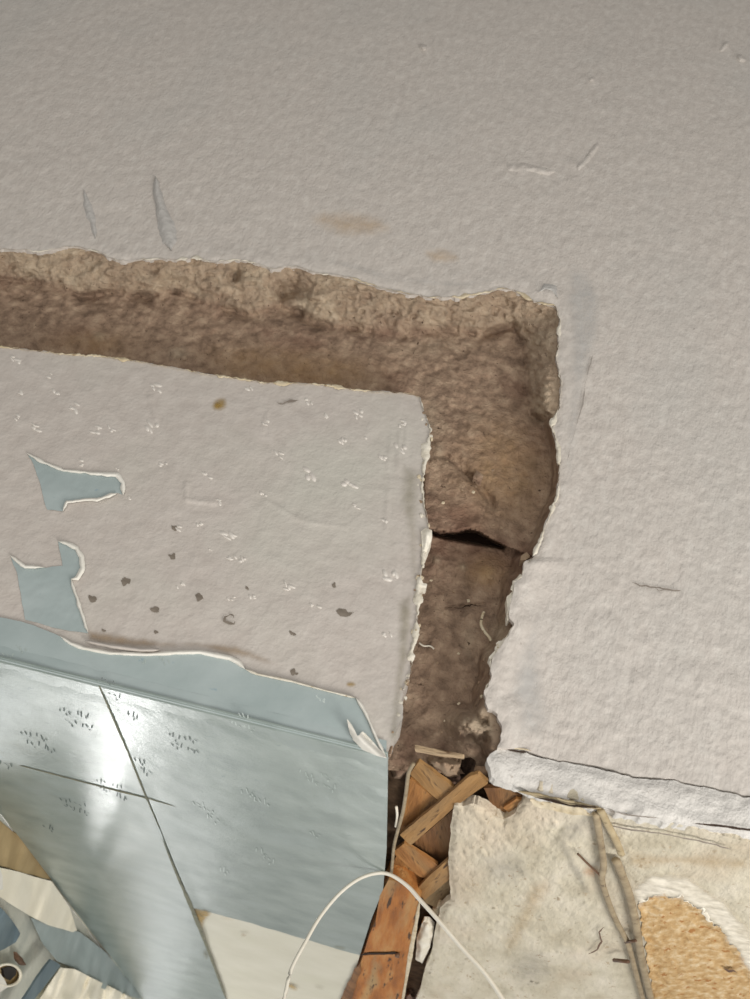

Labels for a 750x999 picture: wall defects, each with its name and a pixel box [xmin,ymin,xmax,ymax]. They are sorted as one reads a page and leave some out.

spalling [0,246,562,774]
crack [444,532,501,547]
crack [507,748,661,780]